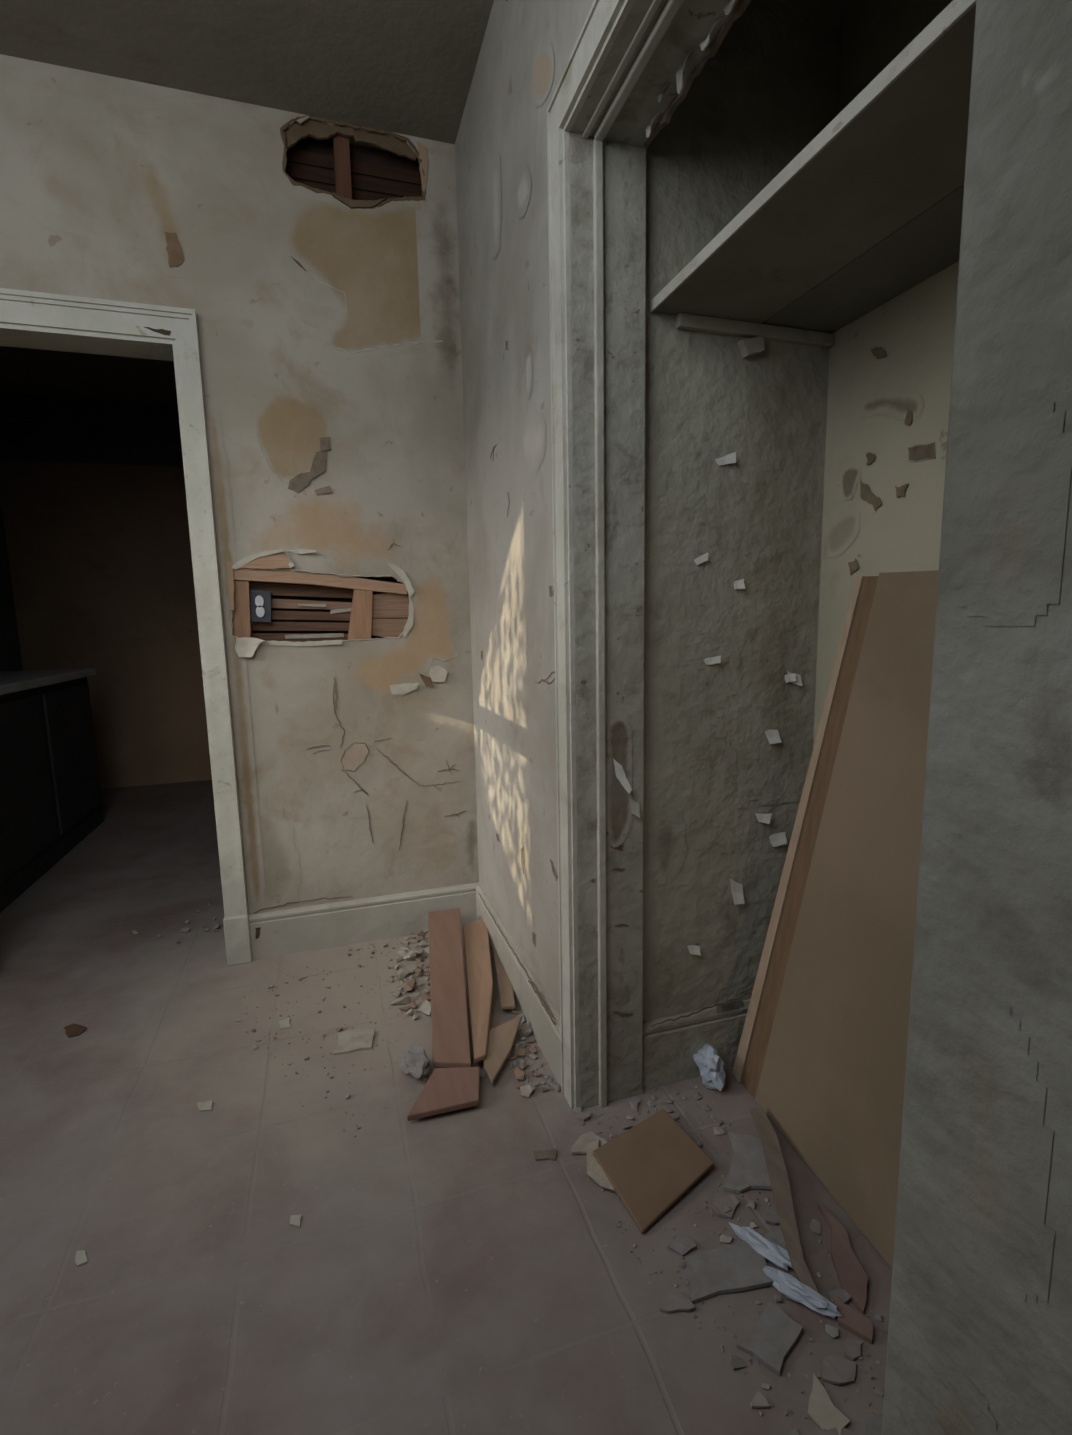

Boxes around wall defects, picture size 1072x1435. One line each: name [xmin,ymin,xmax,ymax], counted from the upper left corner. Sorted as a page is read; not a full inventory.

peeling [643,0,751,147]
peeling [250,389,334,495]
peeling [715,452,736,466]
spalling [908,442,936,463]
peeling [693,552,709,565]
spalling [226,549,461,699]
peeling [704,656,721,665]
peeling [785,670,802,686]
peeling [765,729,782,744]
crack [308,677,466,848]
peeling [754,812,787,847]
peeling [729,878,745,905]